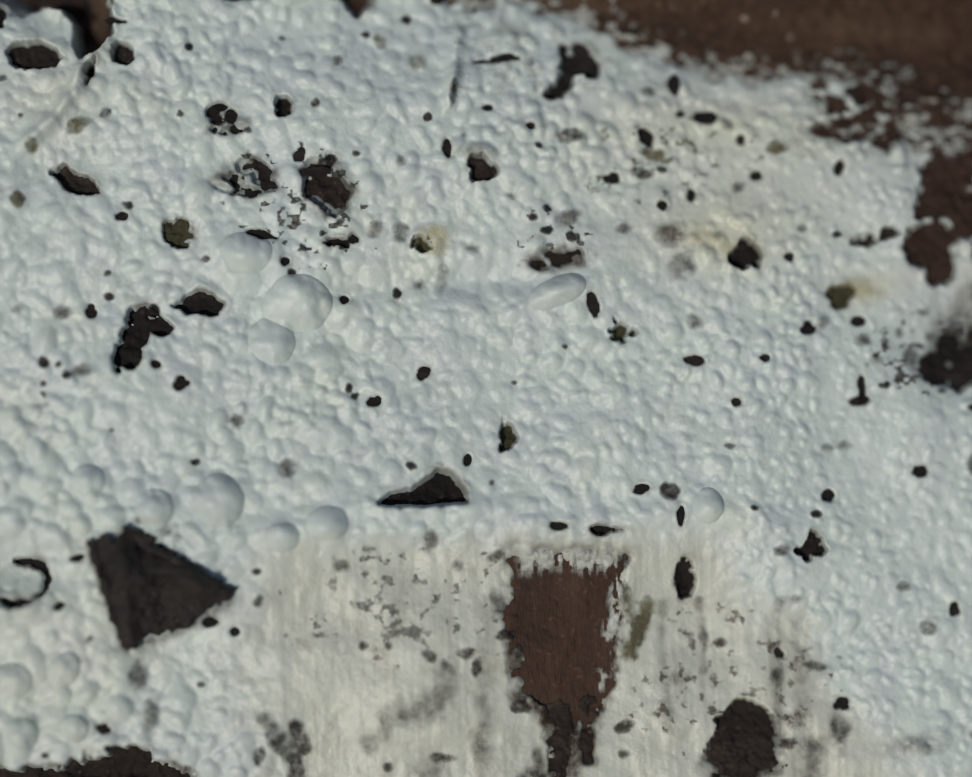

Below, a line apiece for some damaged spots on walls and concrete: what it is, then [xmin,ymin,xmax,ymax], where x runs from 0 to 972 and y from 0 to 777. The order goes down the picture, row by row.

peeling [304,158,350,209]
peeling [811,74,972,285]
peeling [531,249,581,270]
peeling [918,330,972,392]
damp [357,600,449,668]
damp [463,649,481,676]
peeling [502,547,628,777]
damp [621,588,653,659]
damp [255,715,310,777]
damp [510,695,556,727]
damp [614,715,633,733]
peeling [707,699,788,777]